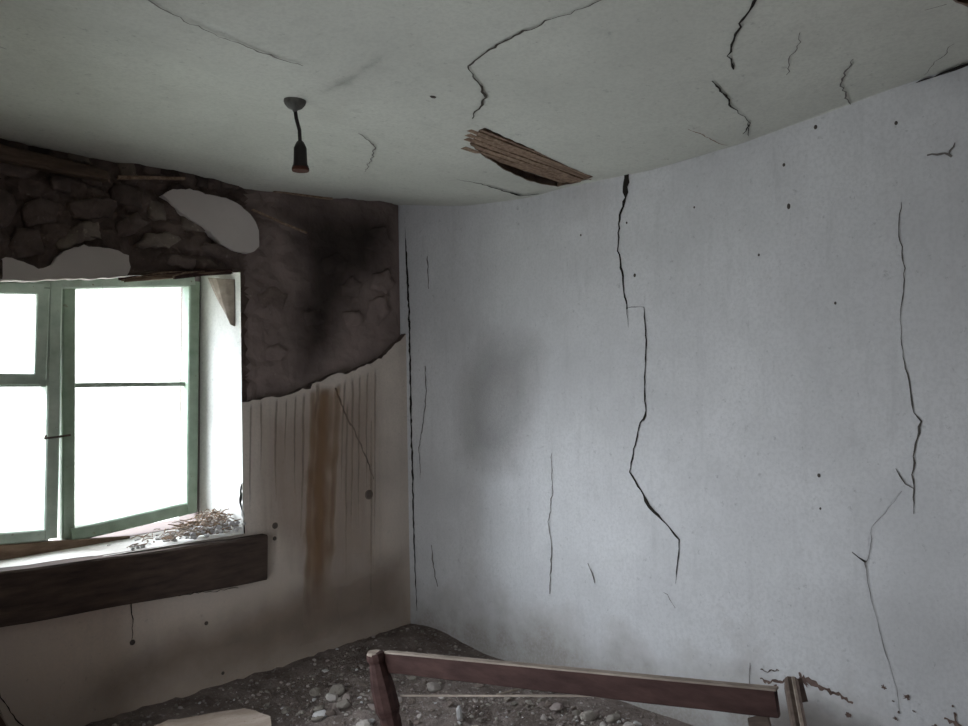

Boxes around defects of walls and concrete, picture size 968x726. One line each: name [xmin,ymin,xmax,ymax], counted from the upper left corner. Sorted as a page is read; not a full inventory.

crack [467,0,601,119]
crack [688,0,757,145]
crack [916,46,968,83]
flaking render [0,138,400,402]
crack [617,174,680,607]
crack [896,203,922,513]